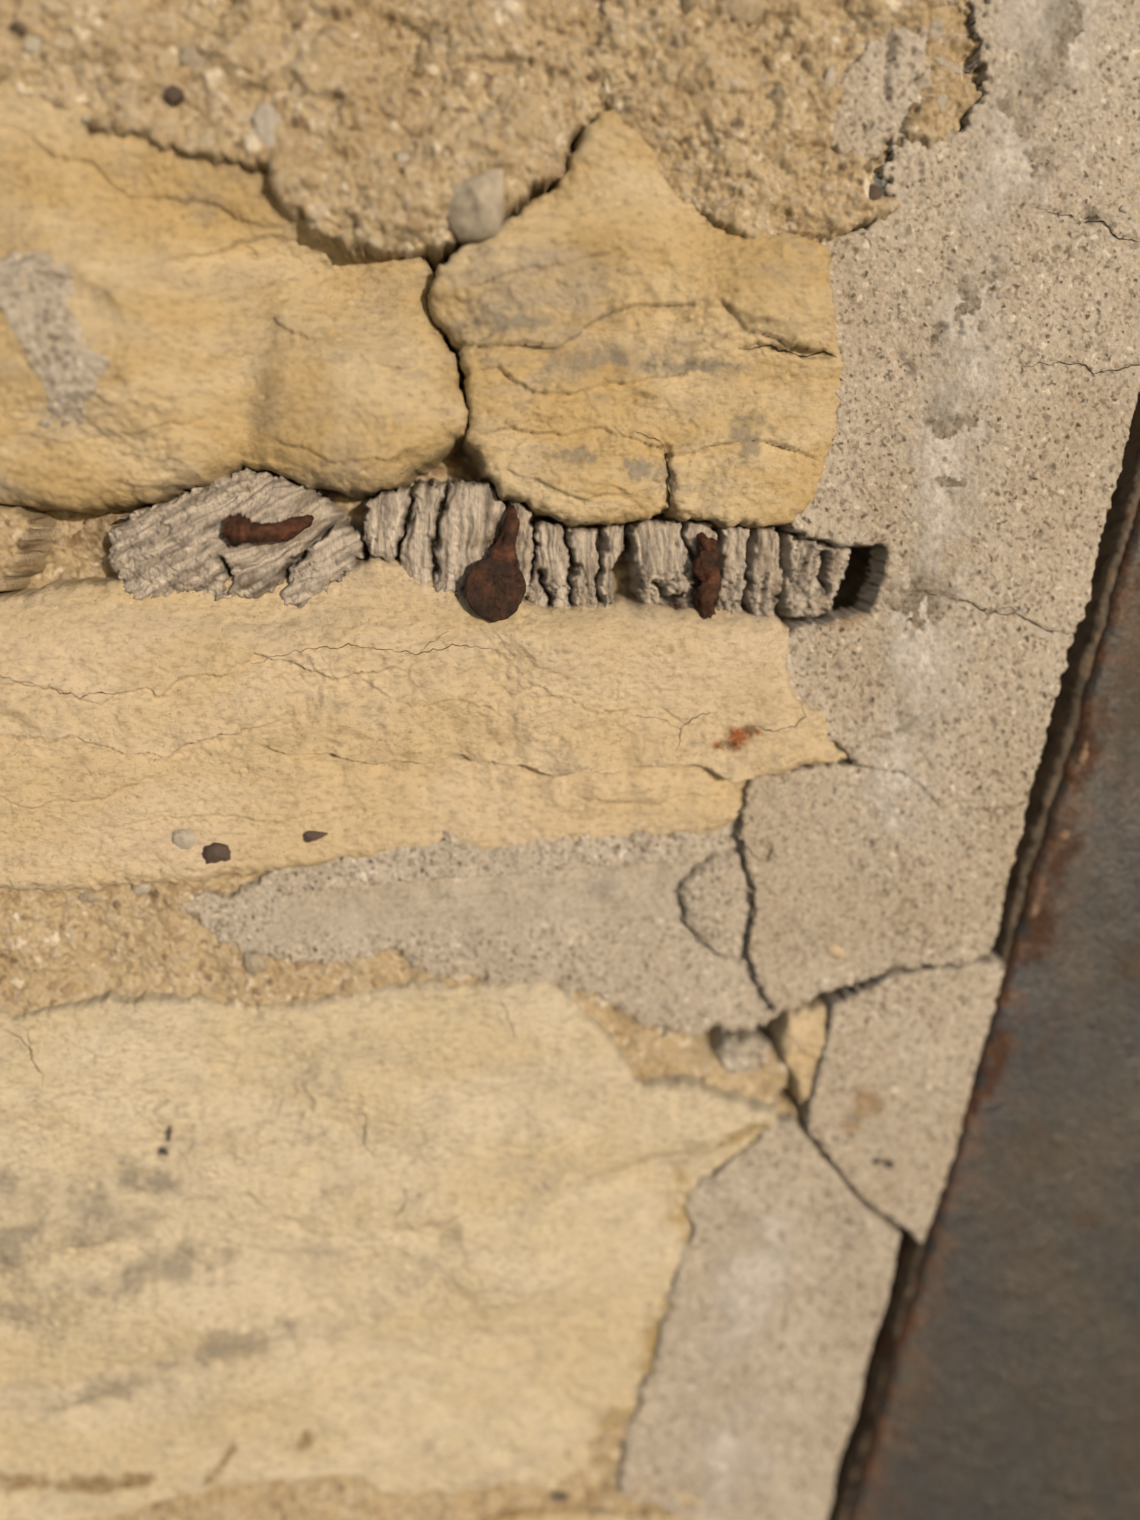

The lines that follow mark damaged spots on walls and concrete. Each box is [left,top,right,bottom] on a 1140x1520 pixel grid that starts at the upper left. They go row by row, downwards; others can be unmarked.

crack [1031,207,1138,242]
rust [666,575,701,610]
crack [889,590,1070,635]
crack [845,761,1027,813]
crack [834,957,981,996]
crack [800,1118,889,1222]